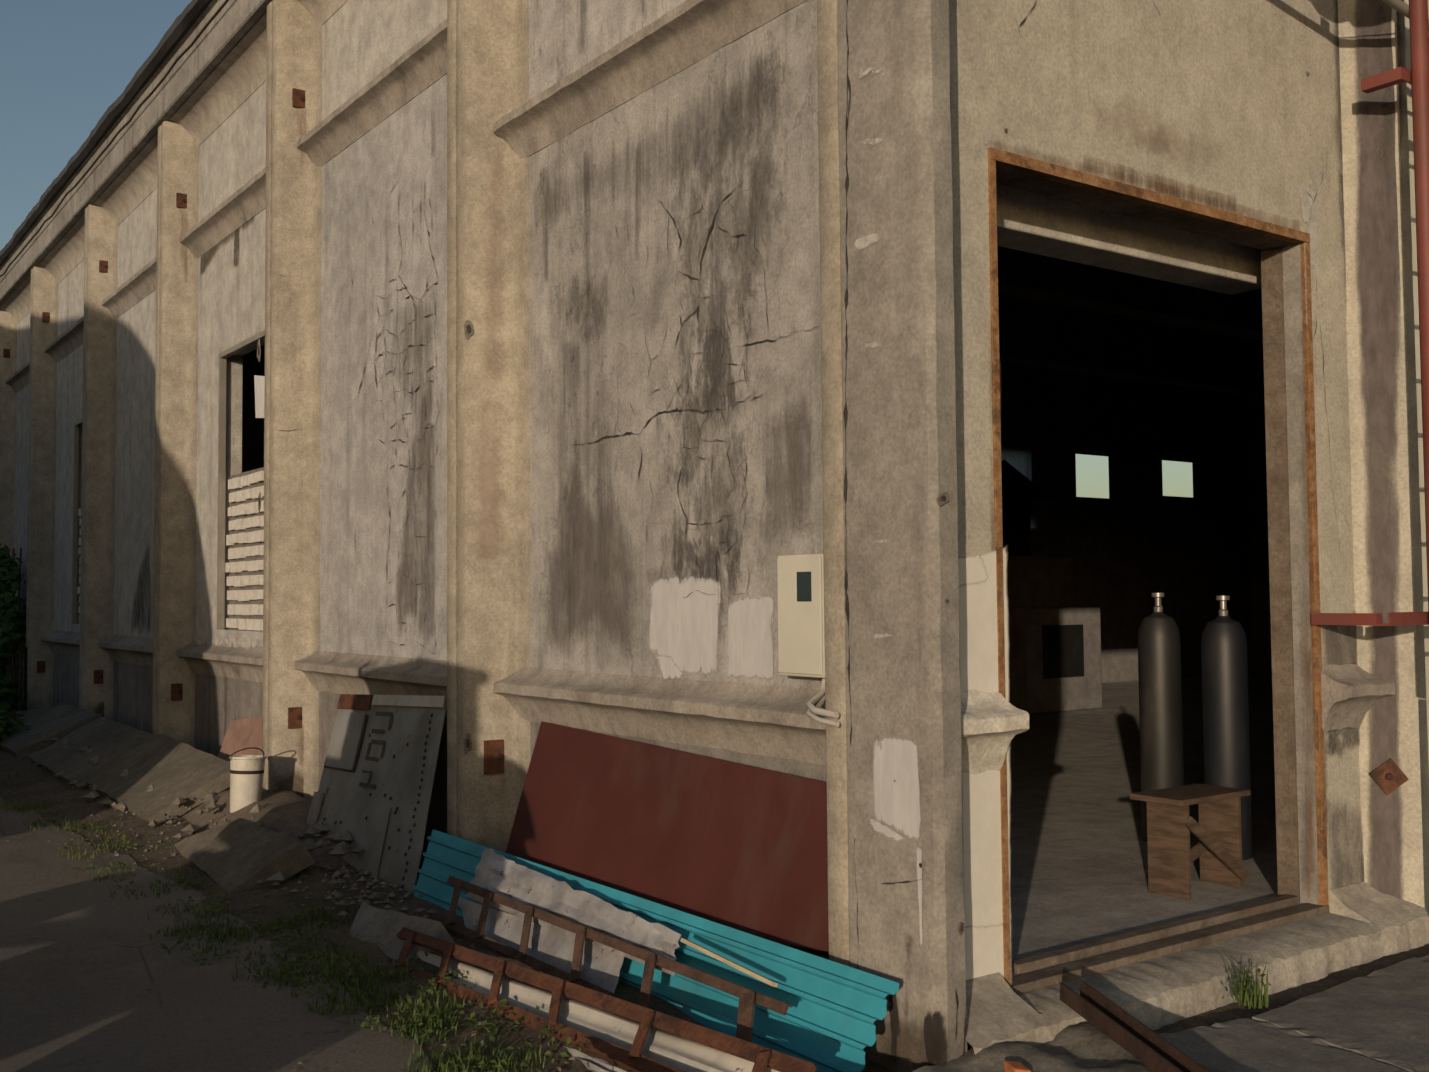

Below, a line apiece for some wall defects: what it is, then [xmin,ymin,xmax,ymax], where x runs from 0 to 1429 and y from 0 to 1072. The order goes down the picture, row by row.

damp [398,402,429,620]
crack [573,0,853,745]
damp [1326,0,1403,900]
crack [854,839,922,969]